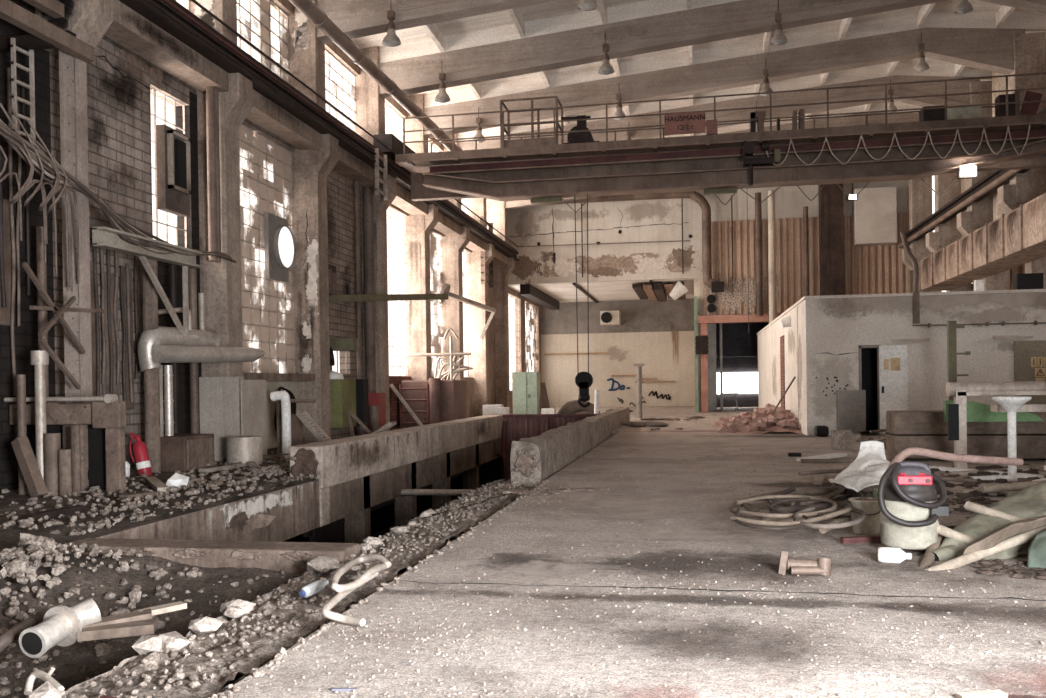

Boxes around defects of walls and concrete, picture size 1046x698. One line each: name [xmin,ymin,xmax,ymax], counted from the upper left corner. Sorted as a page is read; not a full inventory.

flaking render [301,236,319,339]
peeling [512,234,778,315]
flaking render [296,352,312,374]
spalling [226,511,250,534]